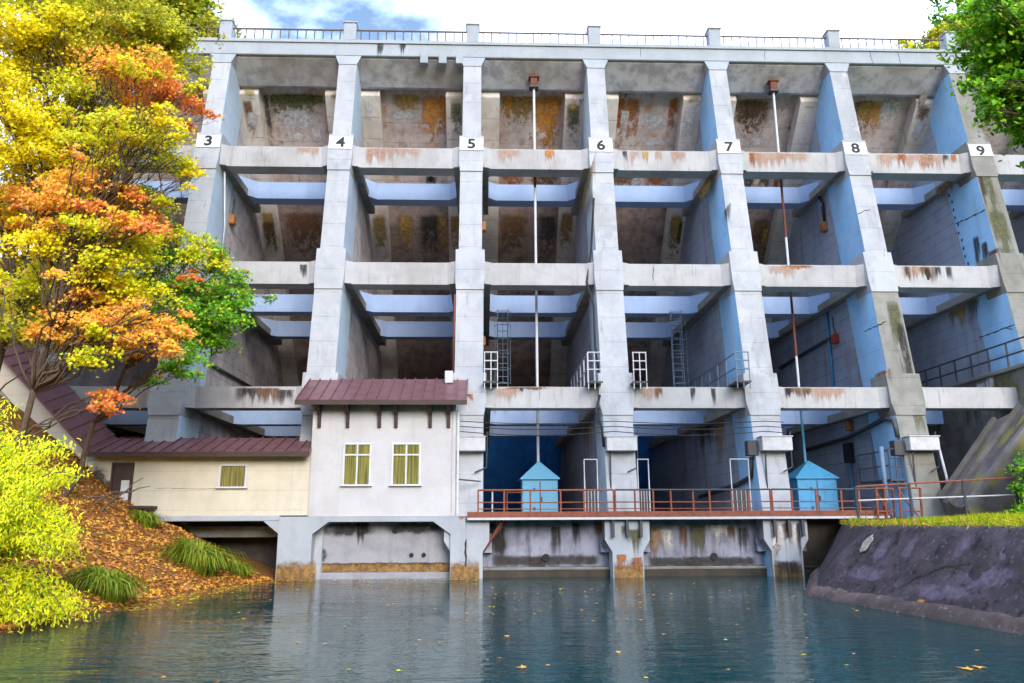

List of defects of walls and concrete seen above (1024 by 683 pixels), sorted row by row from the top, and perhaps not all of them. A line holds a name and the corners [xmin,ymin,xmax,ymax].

rust [502,96,562,158]
rust [623,151,684,161]
rust [749,153,805,163]
rust [880,154,956,166]
leakage [973,177,1010,262]
rust [772,265,809,273]
leakage [888,303,912,373]
leakage [330,522,369,540]
leakage [391,523,439,533]
leakage [489,524,597,567]
leakage [622,525,753,566]
rust [614,555,643,578]